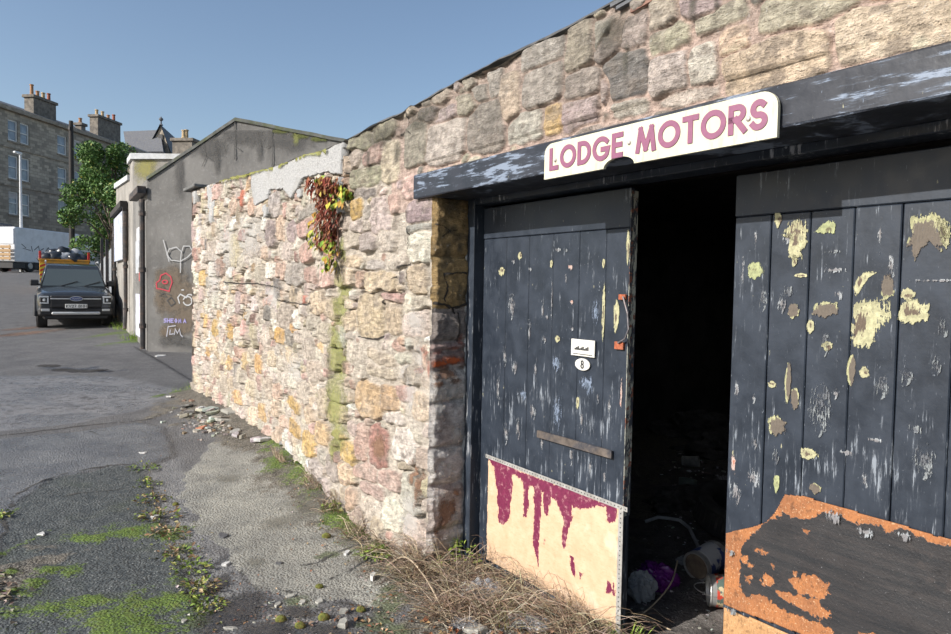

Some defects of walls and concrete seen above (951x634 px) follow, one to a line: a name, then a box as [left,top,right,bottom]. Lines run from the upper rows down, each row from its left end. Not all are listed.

peeling [251,142,349,218]
crack [433,272,467,342]
peeling [741,258,763,284]
peeling [759,213,842,357]
peeling [847,255,951,399]
peeling [906,212,951,261]
peeling [768,363,838,437]
peeling [800,447,819,460]
peeling [909,425,936,481]